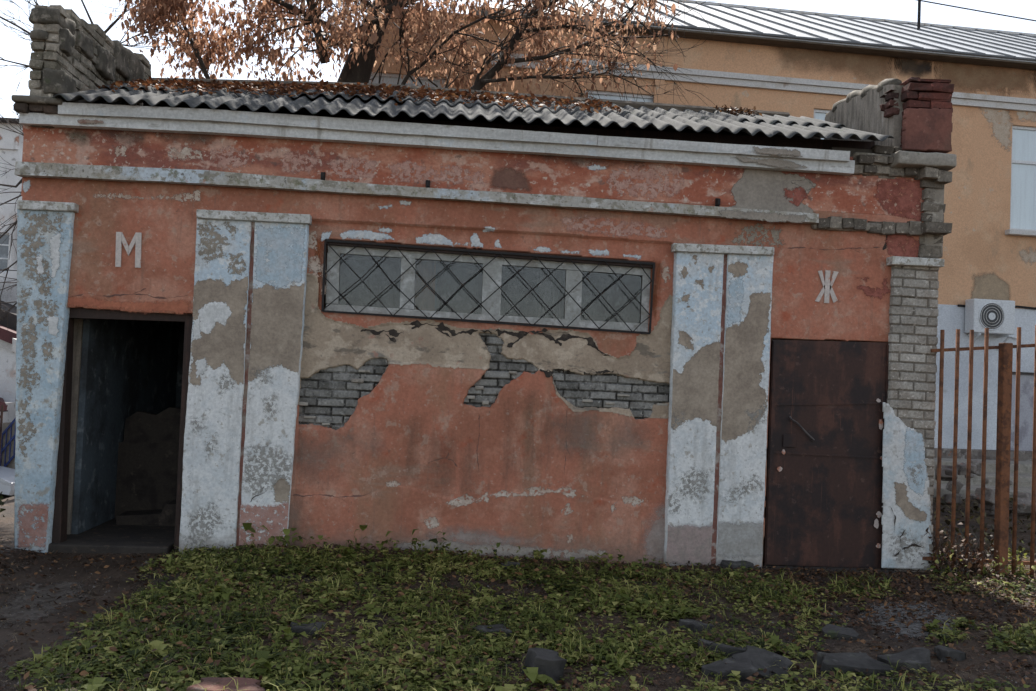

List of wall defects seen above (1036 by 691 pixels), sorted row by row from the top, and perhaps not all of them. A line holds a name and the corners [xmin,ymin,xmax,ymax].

peeling [168,146,248,169]
peeling [282,152,485,185]
peeling [587,164,684,198]
flaking render [784,186,809,206]
flaking render [875,177,924,221]
flaking render [17,211,772,457]
peeling [239,445,292,548]
peeling [668,469,710,512]
flaking render [874,398,933,569]
peeling [18,503,49,549]
peeling [188,503,221,545]